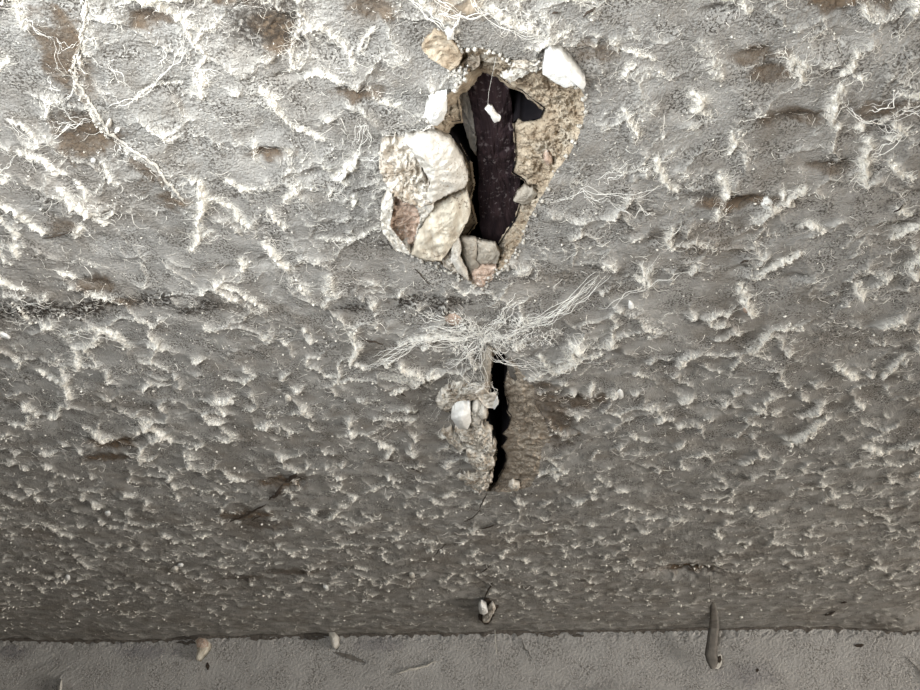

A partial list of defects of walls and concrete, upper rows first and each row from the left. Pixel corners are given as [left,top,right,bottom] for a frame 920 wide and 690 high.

spalling [378,23,588,291]
spalling [436,345,552,494]